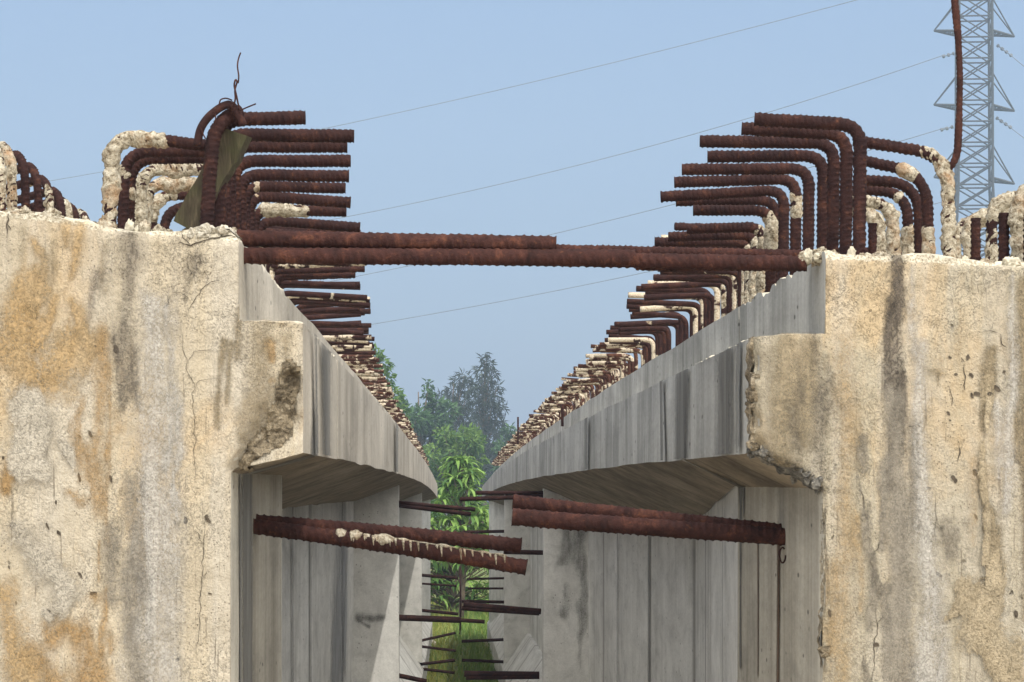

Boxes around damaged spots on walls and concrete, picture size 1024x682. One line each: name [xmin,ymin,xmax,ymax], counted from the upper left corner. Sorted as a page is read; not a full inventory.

spalling [185,223,242,239]
water stain [102,229,185,682]
crack [163,268,219,485]
water stain [214,307,241,429]
spalling [239,359,301,473]
spalling [744,336,823,495]
water stain [878,255,947,682]
water stain [978,275,1024,574]
crack [193,516,207,659]